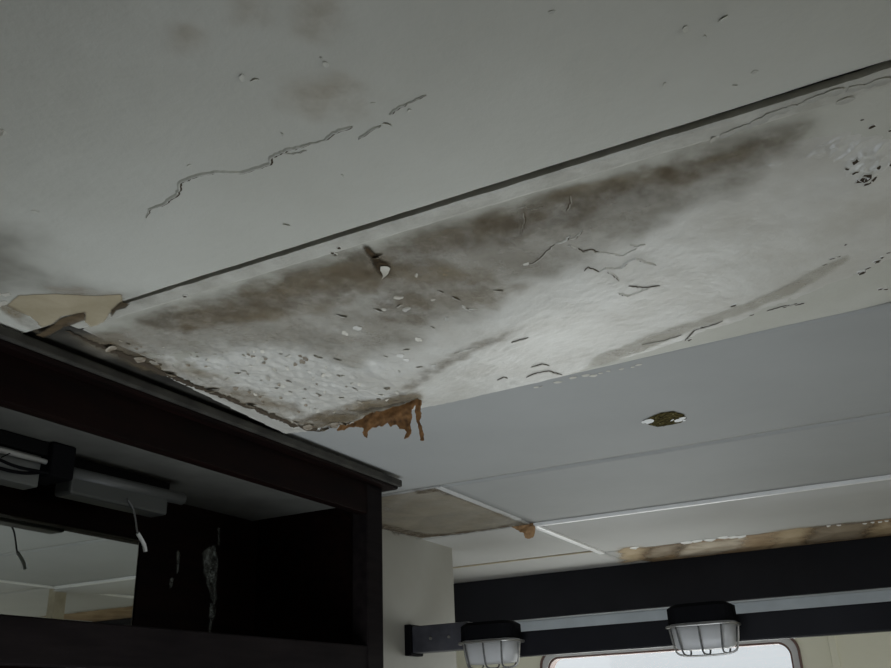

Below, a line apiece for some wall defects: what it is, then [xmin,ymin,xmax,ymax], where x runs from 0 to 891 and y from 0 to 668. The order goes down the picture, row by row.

spalling [754,118,891,188]
damp [274,220,552,301]
peeling [0,293,129,337]
damp [159,297,402,363]
damp [382,488,524,538]